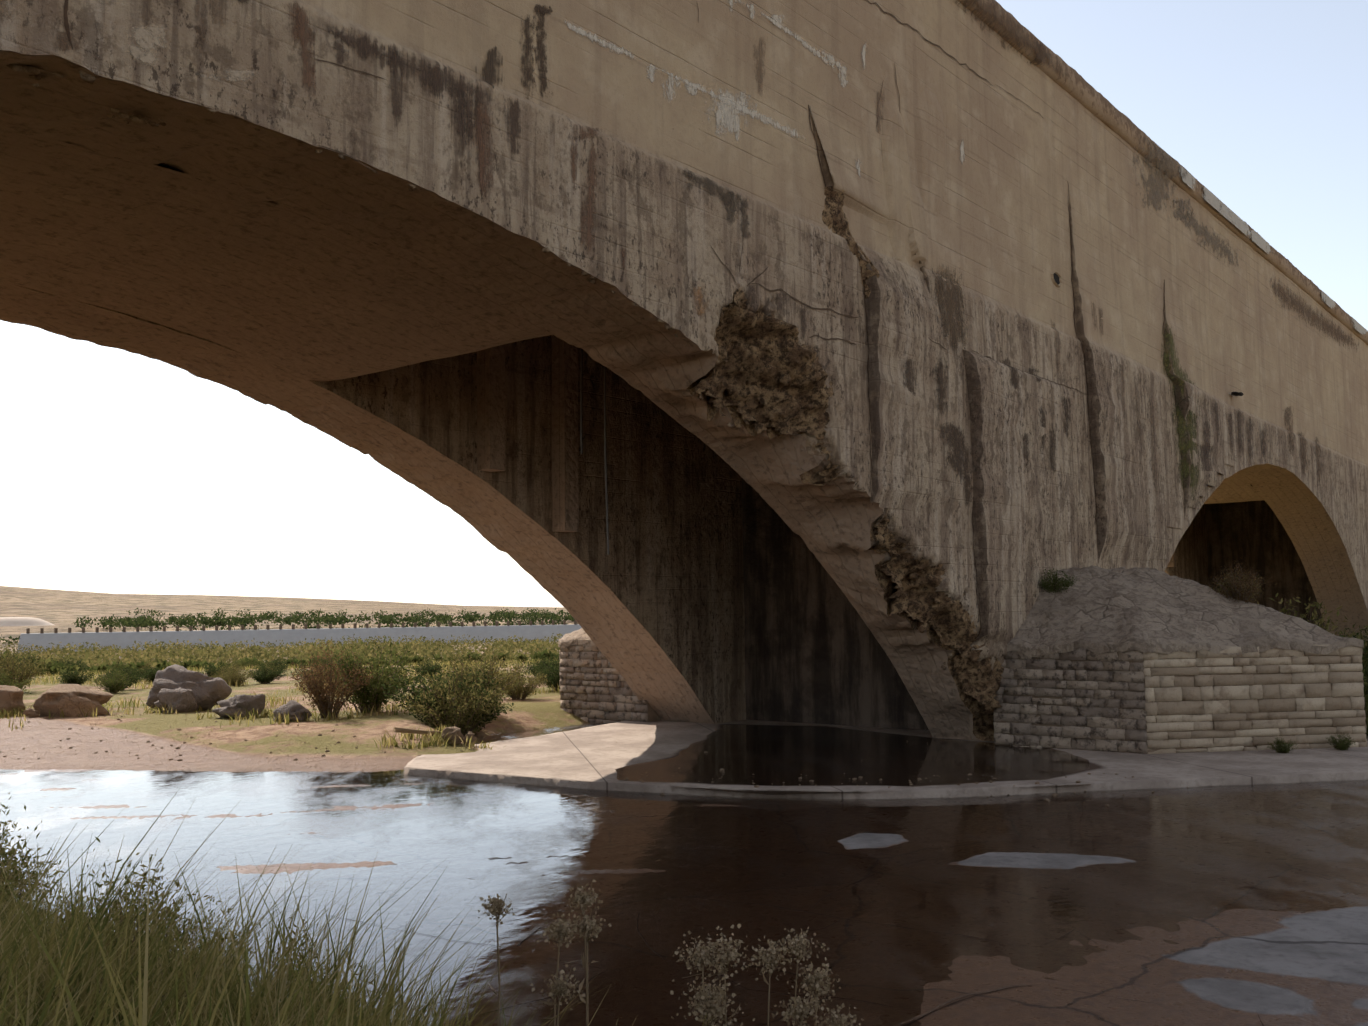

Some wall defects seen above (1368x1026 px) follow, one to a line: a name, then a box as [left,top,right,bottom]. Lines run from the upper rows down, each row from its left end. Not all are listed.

crack [64,0,73,49]
water stain [327,27,503,154]
water stain [505,5,552,158]
water stain [648,40,798,140]
crack [866,0,1044,119]
spalling [688,289,854,484]
crack [710,70,1099,680]
water stain [925,266,982,503]
water stain [1023,397,1071,472]
water stain [1200,404,1267,476]
water stain [1271,278,1359,348]
spalling [873,515,1004,738]